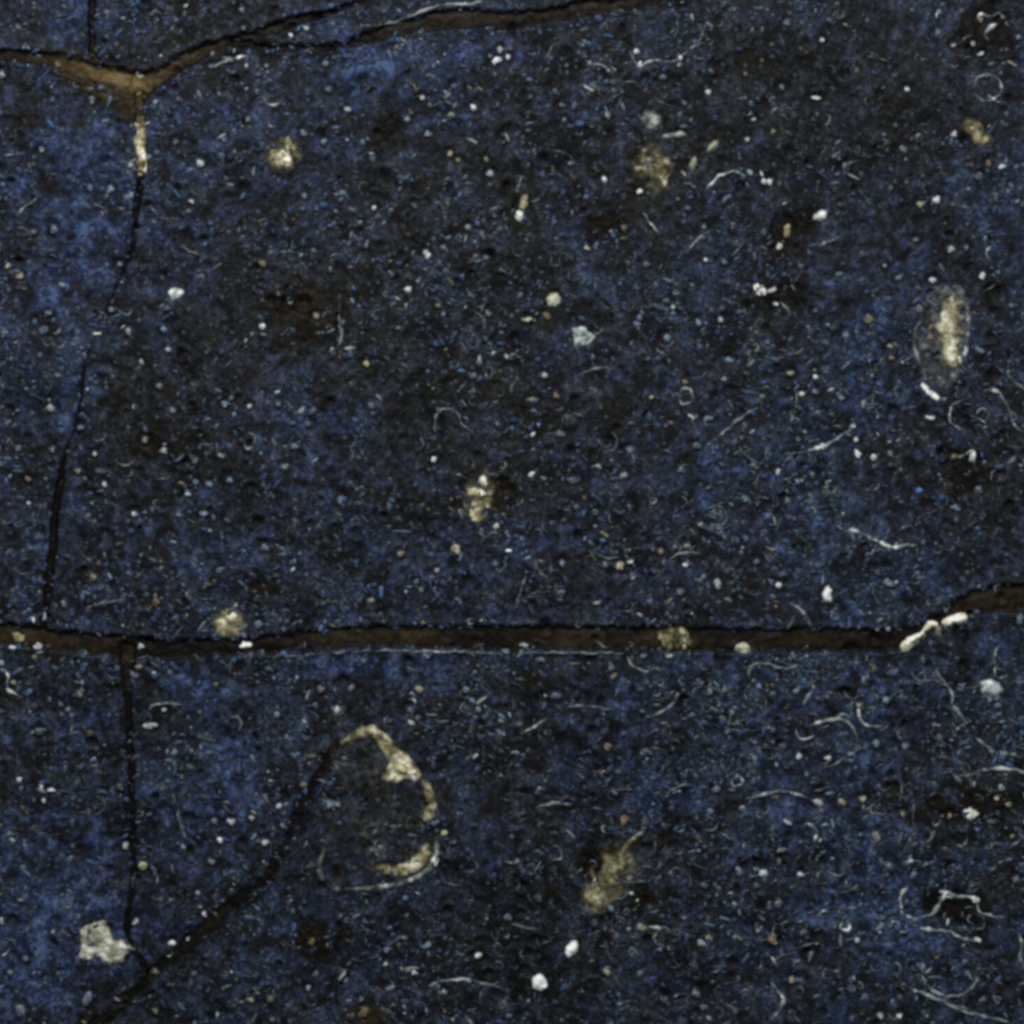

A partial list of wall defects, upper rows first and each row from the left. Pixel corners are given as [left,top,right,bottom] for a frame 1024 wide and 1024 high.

crack [0,0,668,312]
crack [0,340,1024,1024]